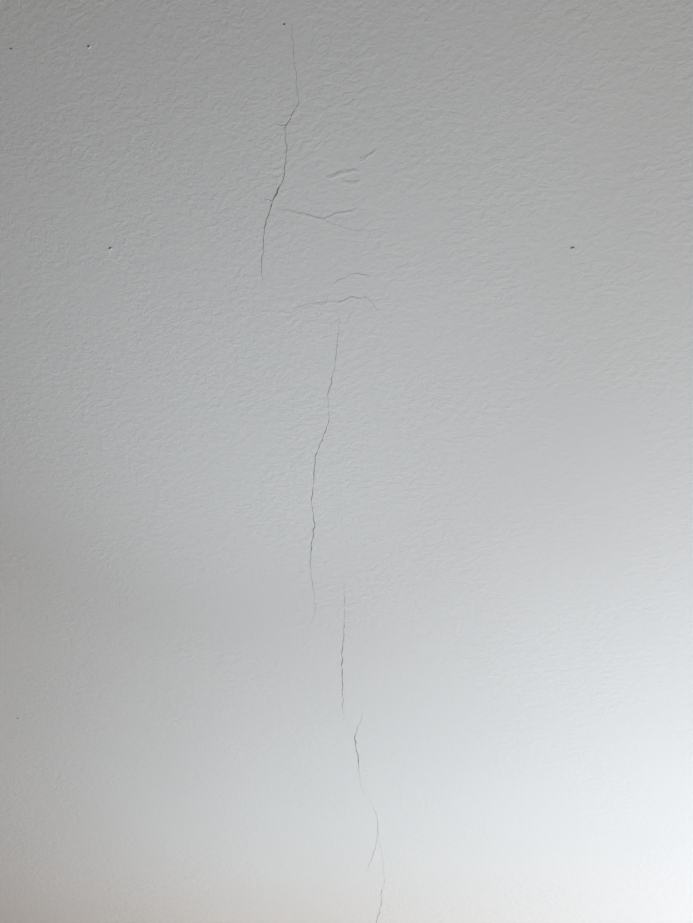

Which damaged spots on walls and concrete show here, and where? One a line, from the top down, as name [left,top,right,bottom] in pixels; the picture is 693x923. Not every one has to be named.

crack [261,27,357,280]
crack [310,273,375,622]